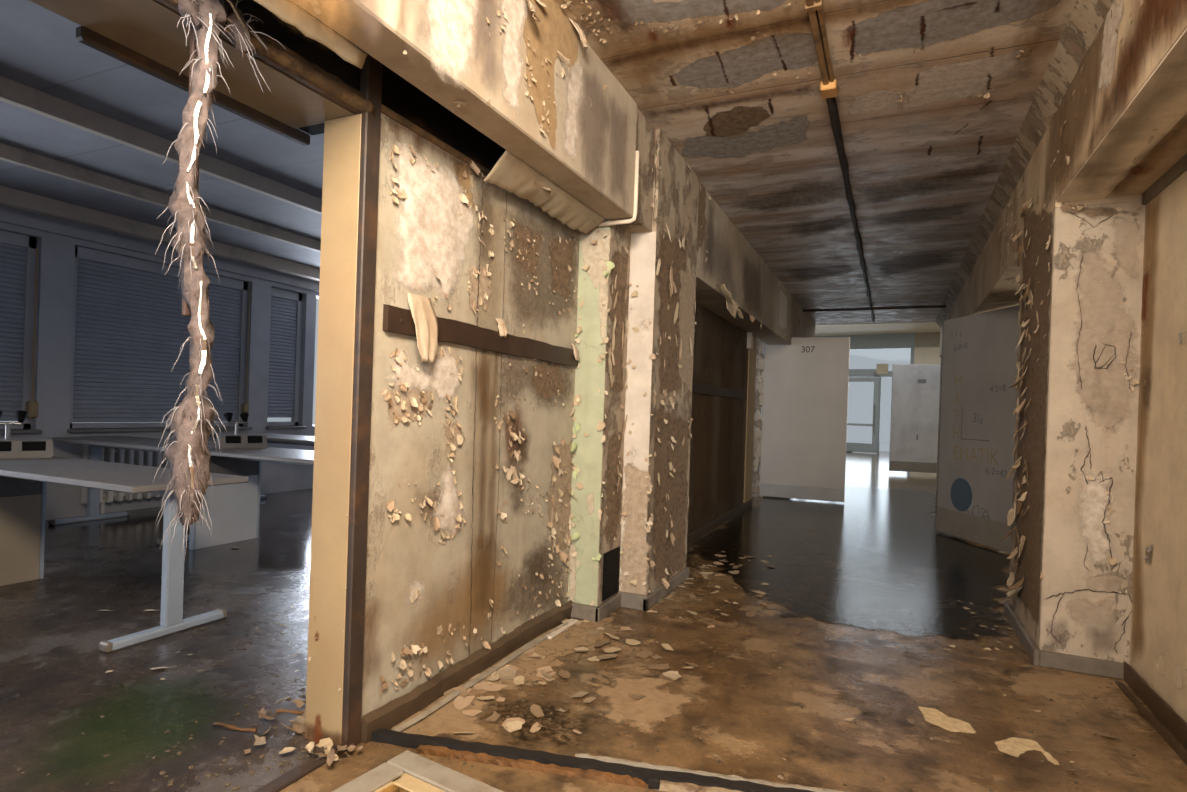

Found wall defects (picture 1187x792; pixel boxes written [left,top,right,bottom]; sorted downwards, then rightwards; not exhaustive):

water stain [558,0,756,81]
peeling [523,0,797,150]
water stain [653,88,807,115]
spalling [847,0,1061,56]
peeling [381,285,465,459]
peeling [454,162,508,338]
water stain [502,356,575,409]
peeling [494,32,818,607]
peeling [991,0,1143,622]
crack [1076,256,1139,392]
water stain [510,547,565,623]
crack [1040,426,1132,653]